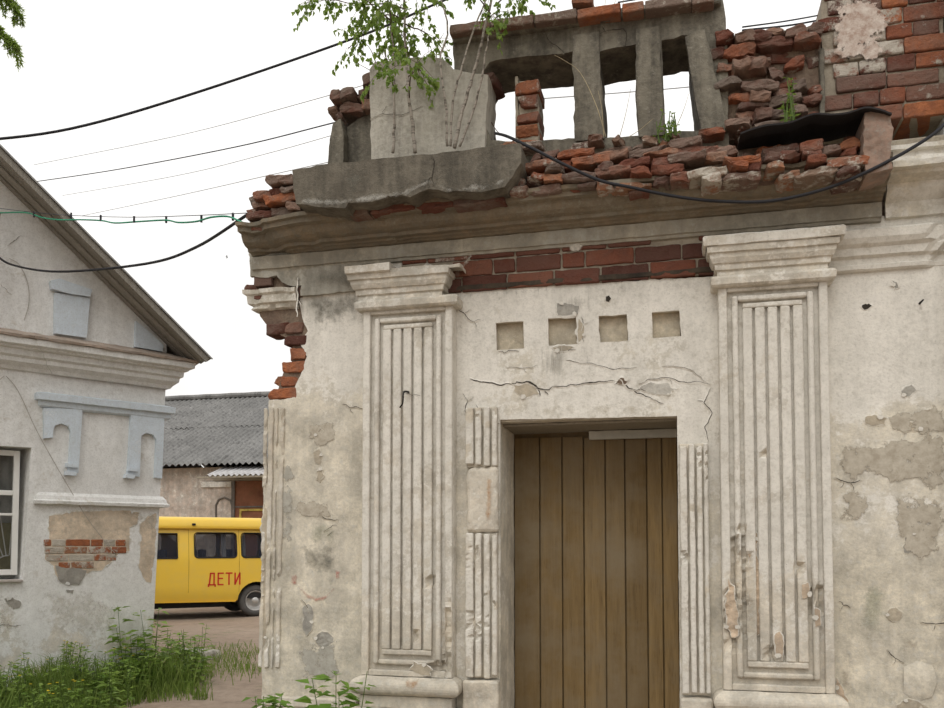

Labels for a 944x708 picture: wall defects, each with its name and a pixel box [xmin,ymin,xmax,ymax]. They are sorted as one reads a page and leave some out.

crack [462,317,712,442]
flaking render [283,466,330,540]
flaking render [308,423,335,483]
flaking render [839,405,944,560]
flaking render [43,509,158,594]
flaking render [724,532,760,638]
flaking render [299,603,339,679]